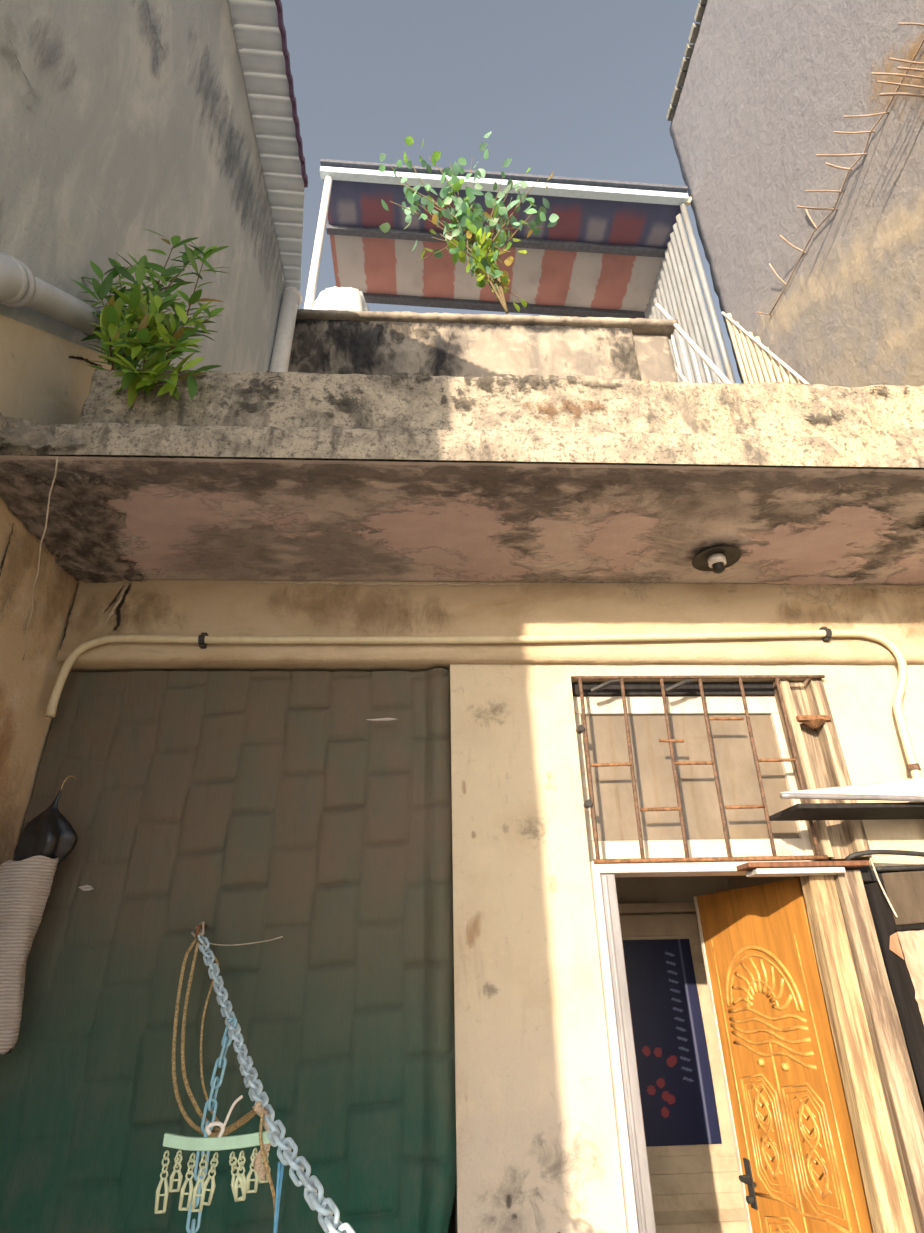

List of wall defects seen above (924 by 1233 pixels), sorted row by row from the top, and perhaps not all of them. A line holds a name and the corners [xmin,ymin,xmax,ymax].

water stain [223,371,283,414]
water stain [290,319,641,422]
water stain [802,406,845,423]
crack [0,523,14,576]
water stain [180,520,669,625]
water stain [7,460,924,595]
crack [60,583,79,650]
crack [99,582,131,633]